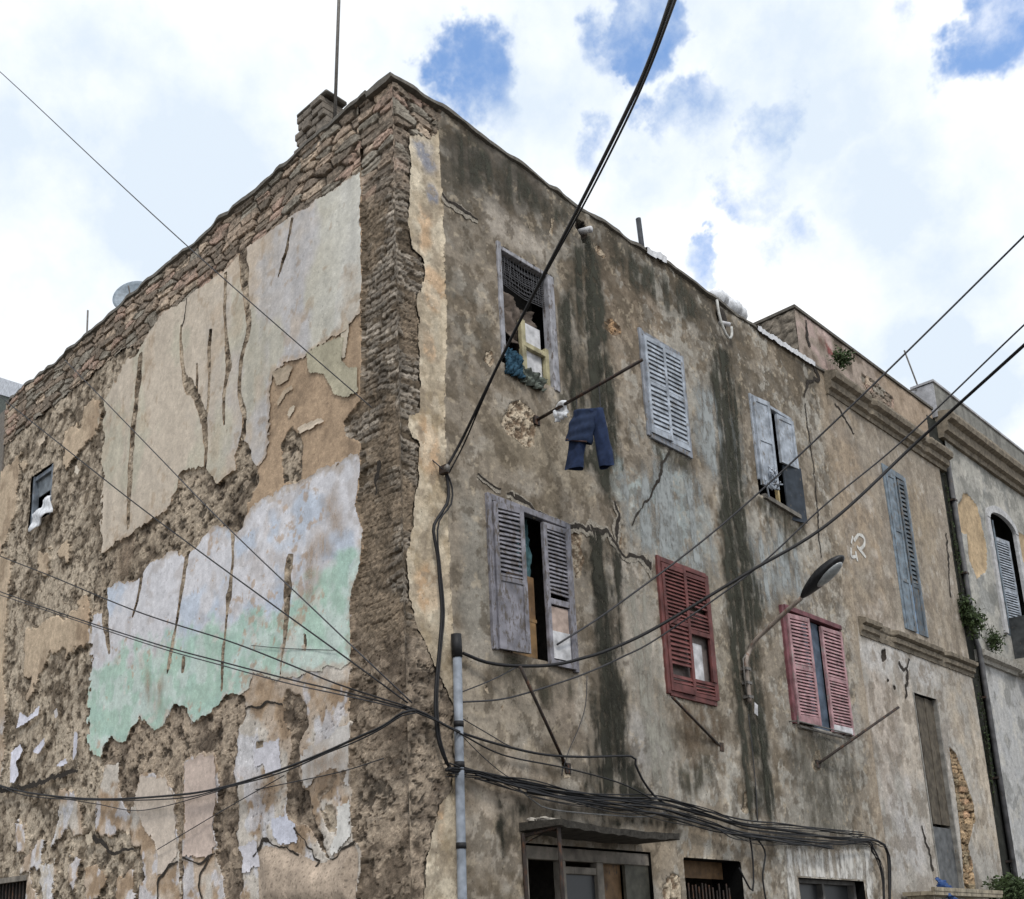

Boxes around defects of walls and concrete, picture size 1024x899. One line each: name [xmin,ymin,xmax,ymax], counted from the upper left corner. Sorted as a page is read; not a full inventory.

flaking render [0,81,457,899]
flaking render [501,400,537,447]
crack [477,448,673,579]
leakage [557,236,623,500]
leakage [585,534,645,804]
leakage [710,347,775,820]
leakage [496,799,505,847]
flaking render [949,748,976,889]